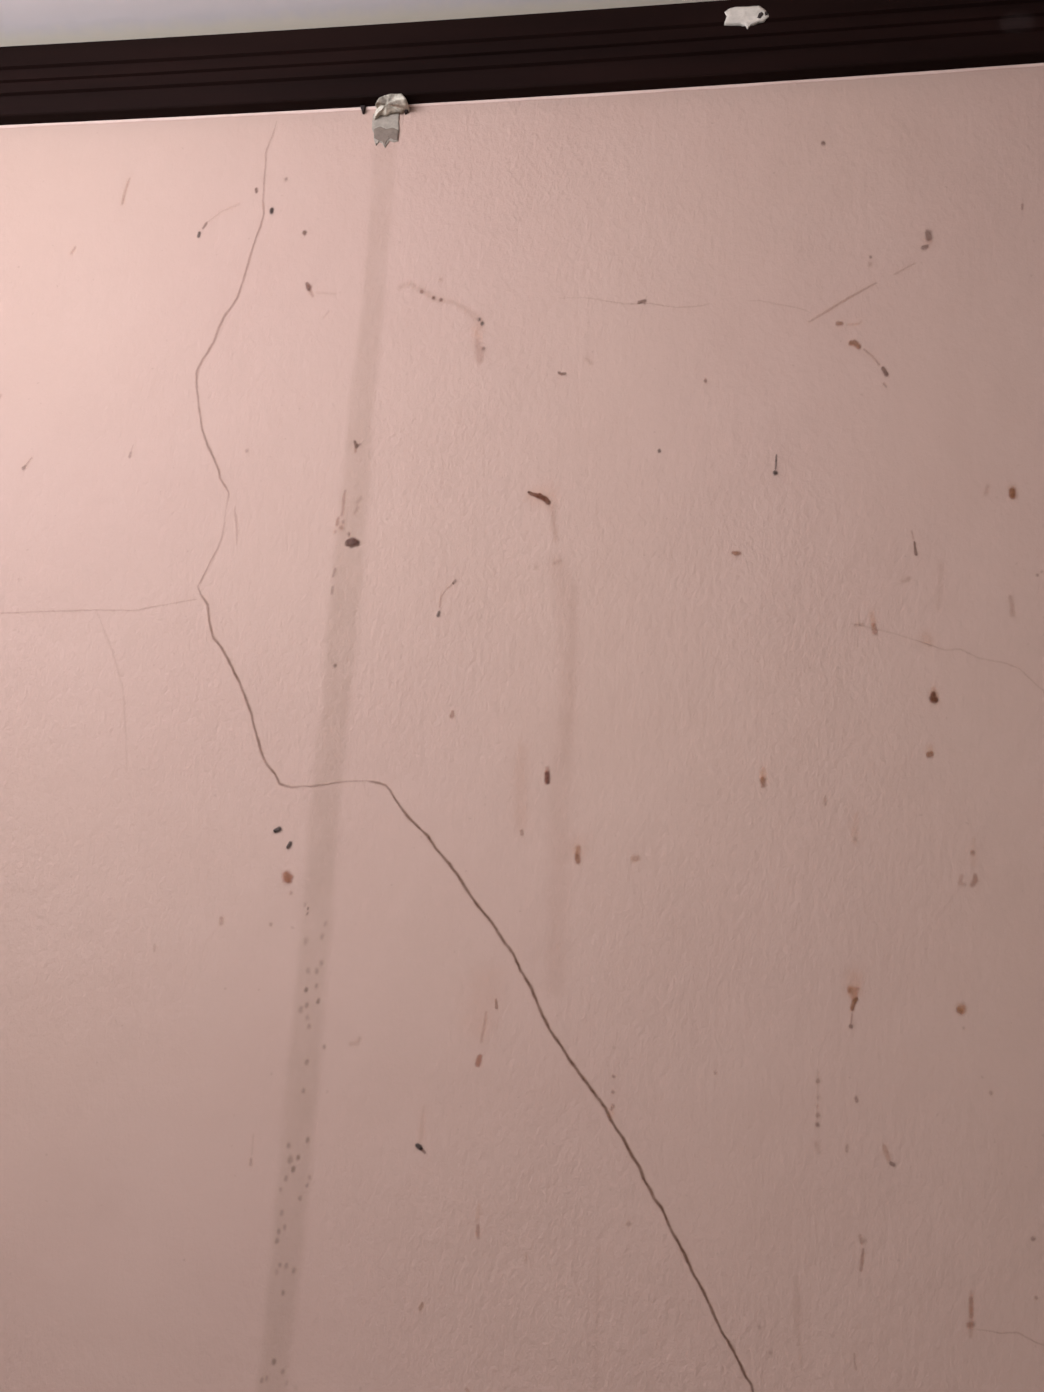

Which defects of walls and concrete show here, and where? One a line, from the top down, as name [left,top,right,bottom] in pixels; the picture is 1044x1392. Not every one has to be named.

crack [406,814,754,1392]